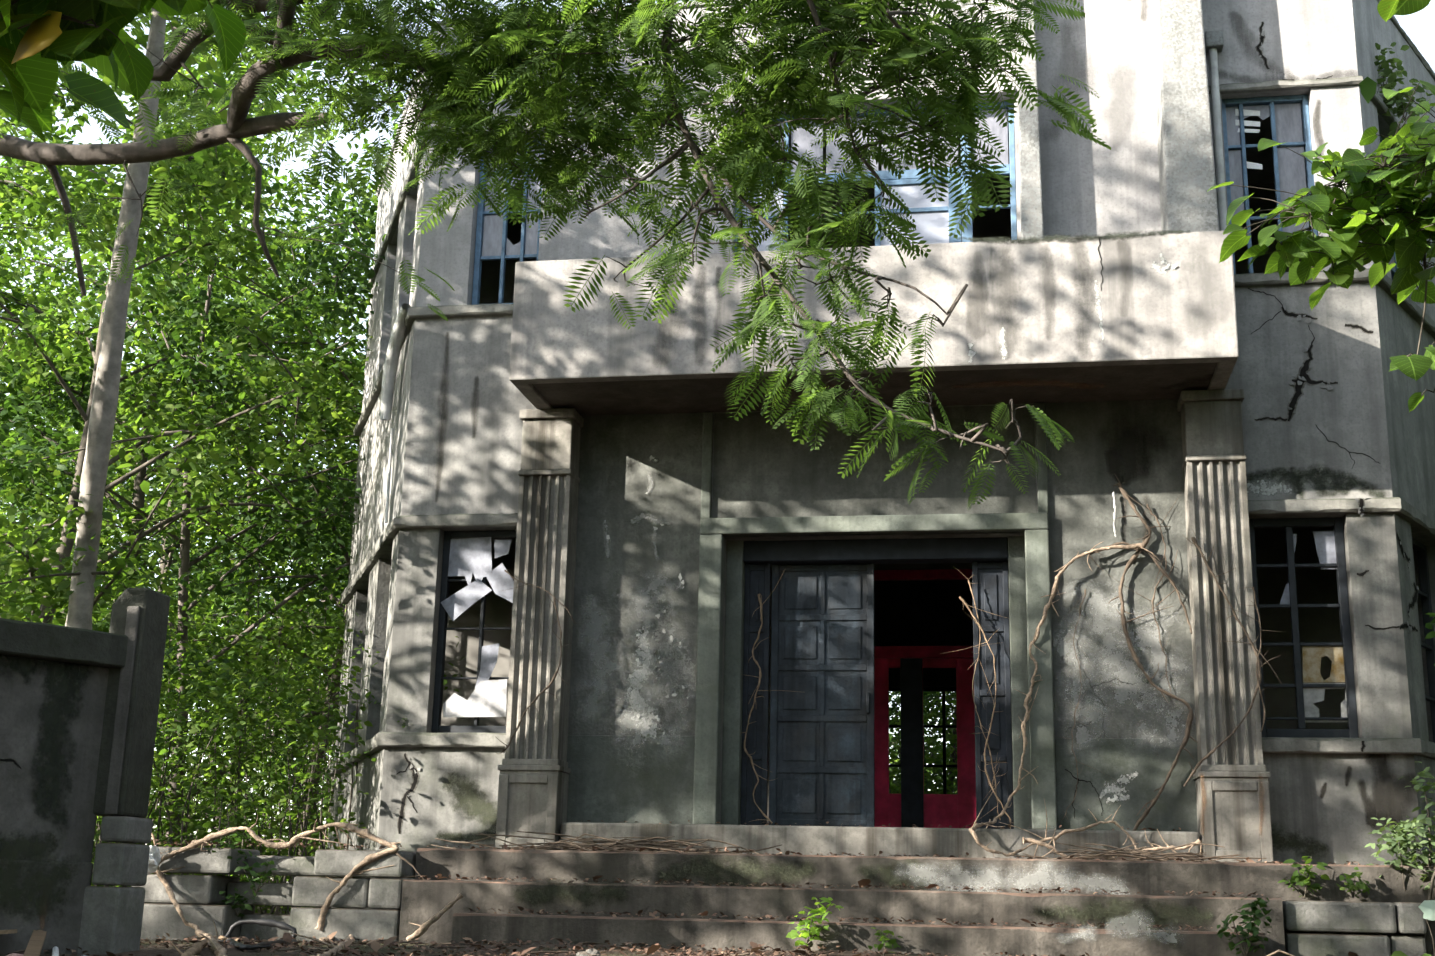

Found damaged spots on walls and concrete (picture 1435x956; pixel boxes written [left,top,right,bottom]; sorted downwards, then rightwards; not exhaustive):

crack [1255,22,1333,81]
damp [696,269,720,351]
damp [959,230,1190,363]
damp [436,333,448,501]
crack [1248,288,1379,518]
damp [1246,467,1385,498]
crack [1357,569,1370,577]
crack [1365,530,1419,634]
peeling [624,602,696,741]
crack [0,758,22,769]
damp [0,654,91,826]
crack [396,753,421,834]